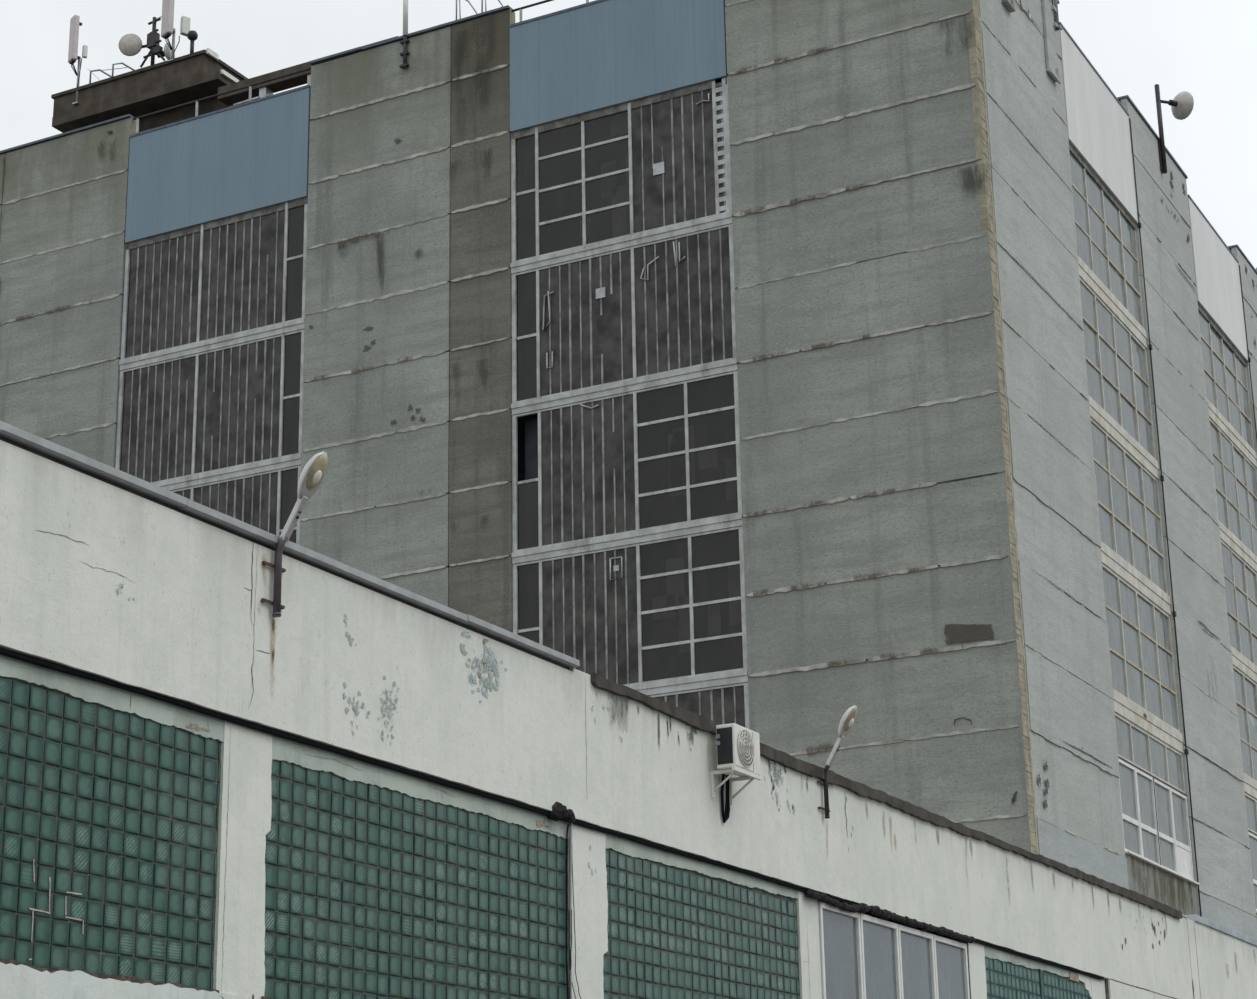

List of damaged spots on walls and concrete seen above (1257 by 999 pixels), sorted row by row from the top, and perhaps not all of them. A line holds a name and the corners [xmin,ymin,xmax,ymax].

crack [36,530,131,581]
crack [246,544,269,704]
peeling [343,667,399,744]
peeling [460,631,508,703]